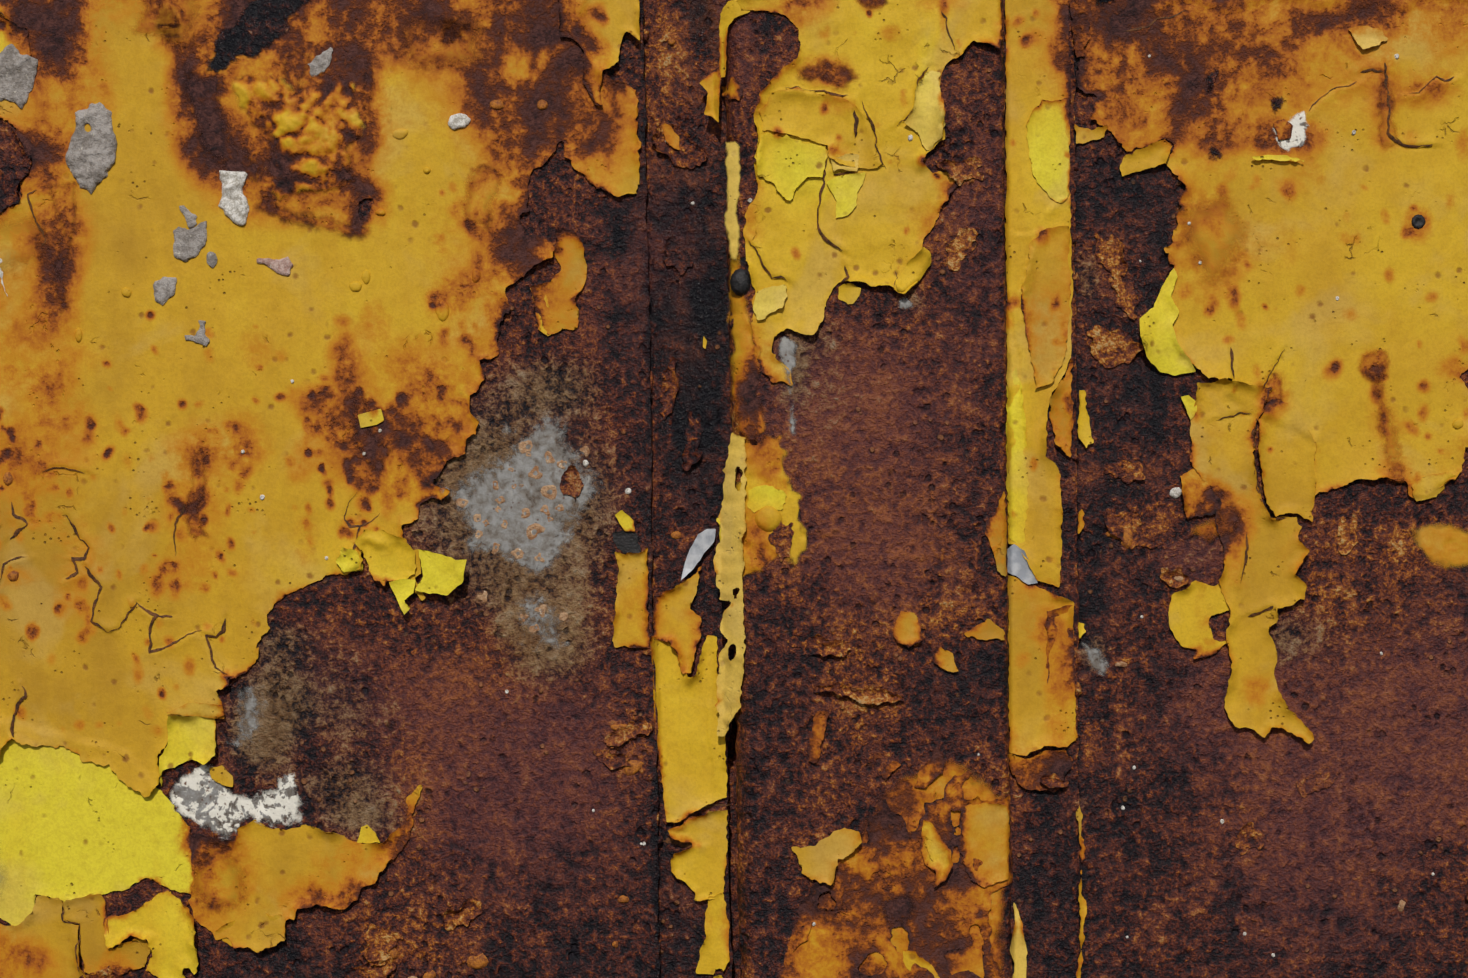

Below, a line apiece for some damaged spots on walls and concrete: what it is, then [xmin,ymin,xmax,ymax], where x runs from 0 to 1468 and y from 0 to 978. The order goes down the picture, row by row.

corrosion [184,0,368,238]
crack [785,11,955,282]
crack [749,241,786,280]
corrosion [1086,233,1144,368]
crack [0,502,28,580]
crack [66,517,226,674]
crack [173,504,185,552]
peeling [0,0,642,978]
corrosion [768,522,794,562]
peeling [612,0,1468,978]
corrosion [1415,525,1468,567]
corrosion [861,762,1003,863]